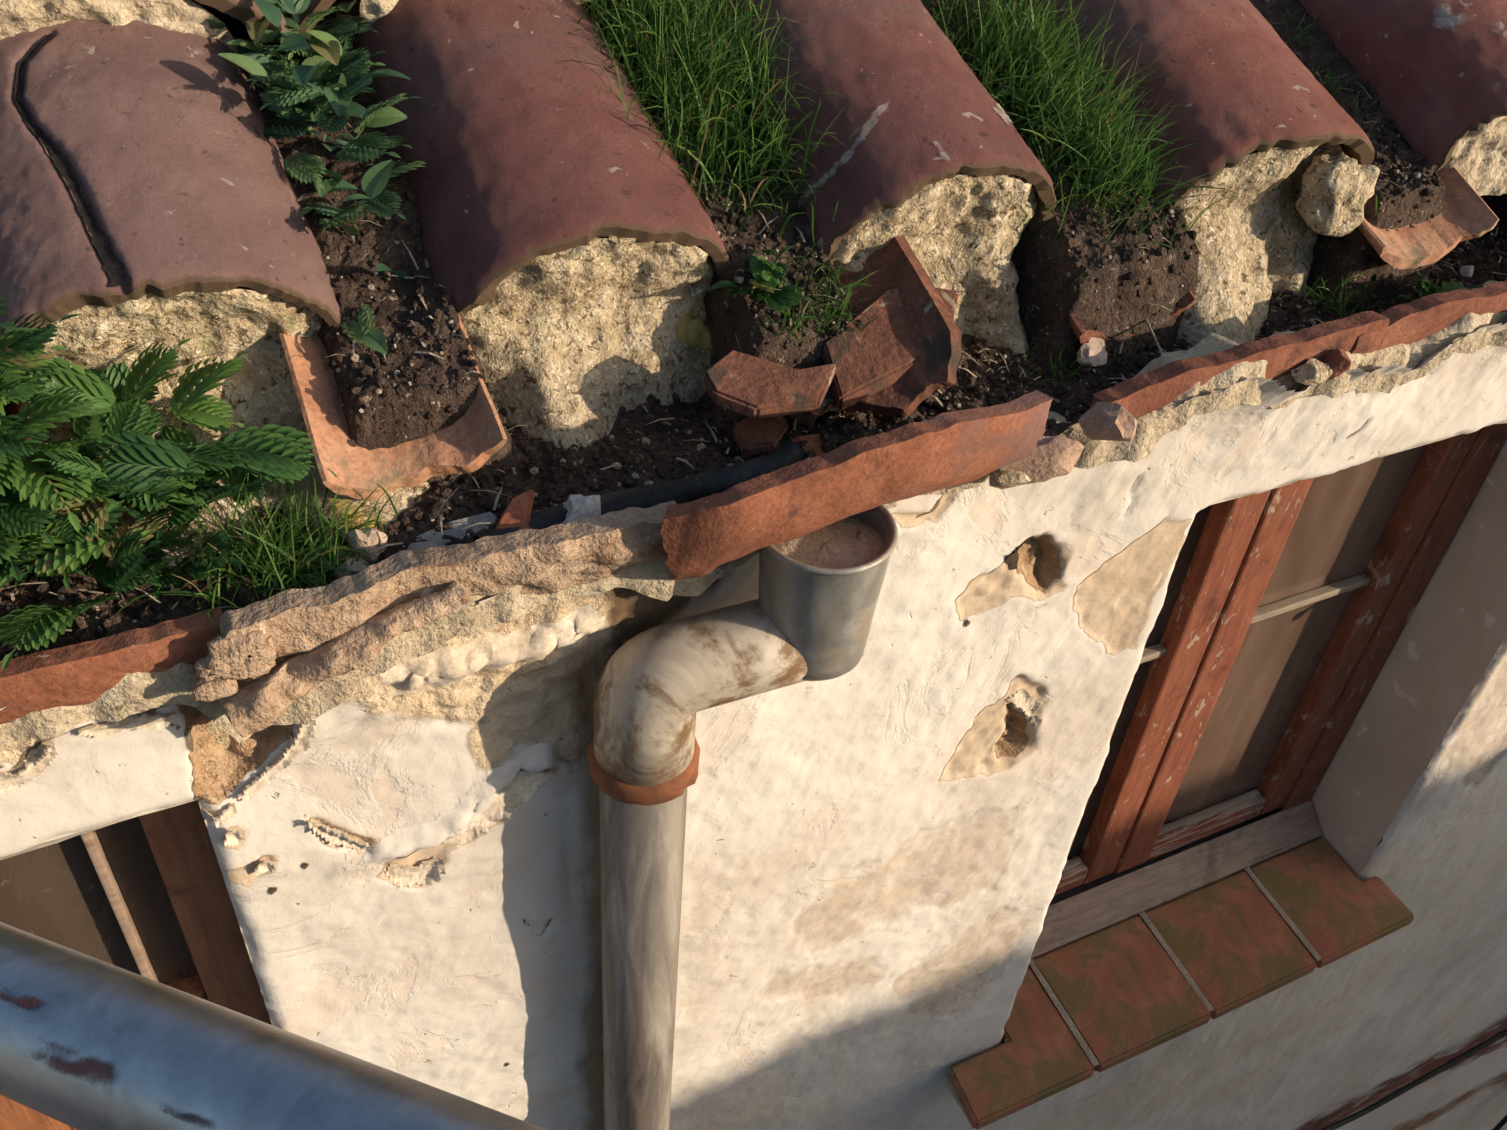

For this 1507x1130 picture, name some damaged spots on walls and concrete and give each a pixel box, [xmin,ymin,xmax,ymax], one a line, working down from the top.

crack [14,34,132,287]
flaking render [955,517,1192,656]
spalling [0,500,677,895]
spalling [939,674,1047,781]
corrosion [1296,1015,1507,1130]